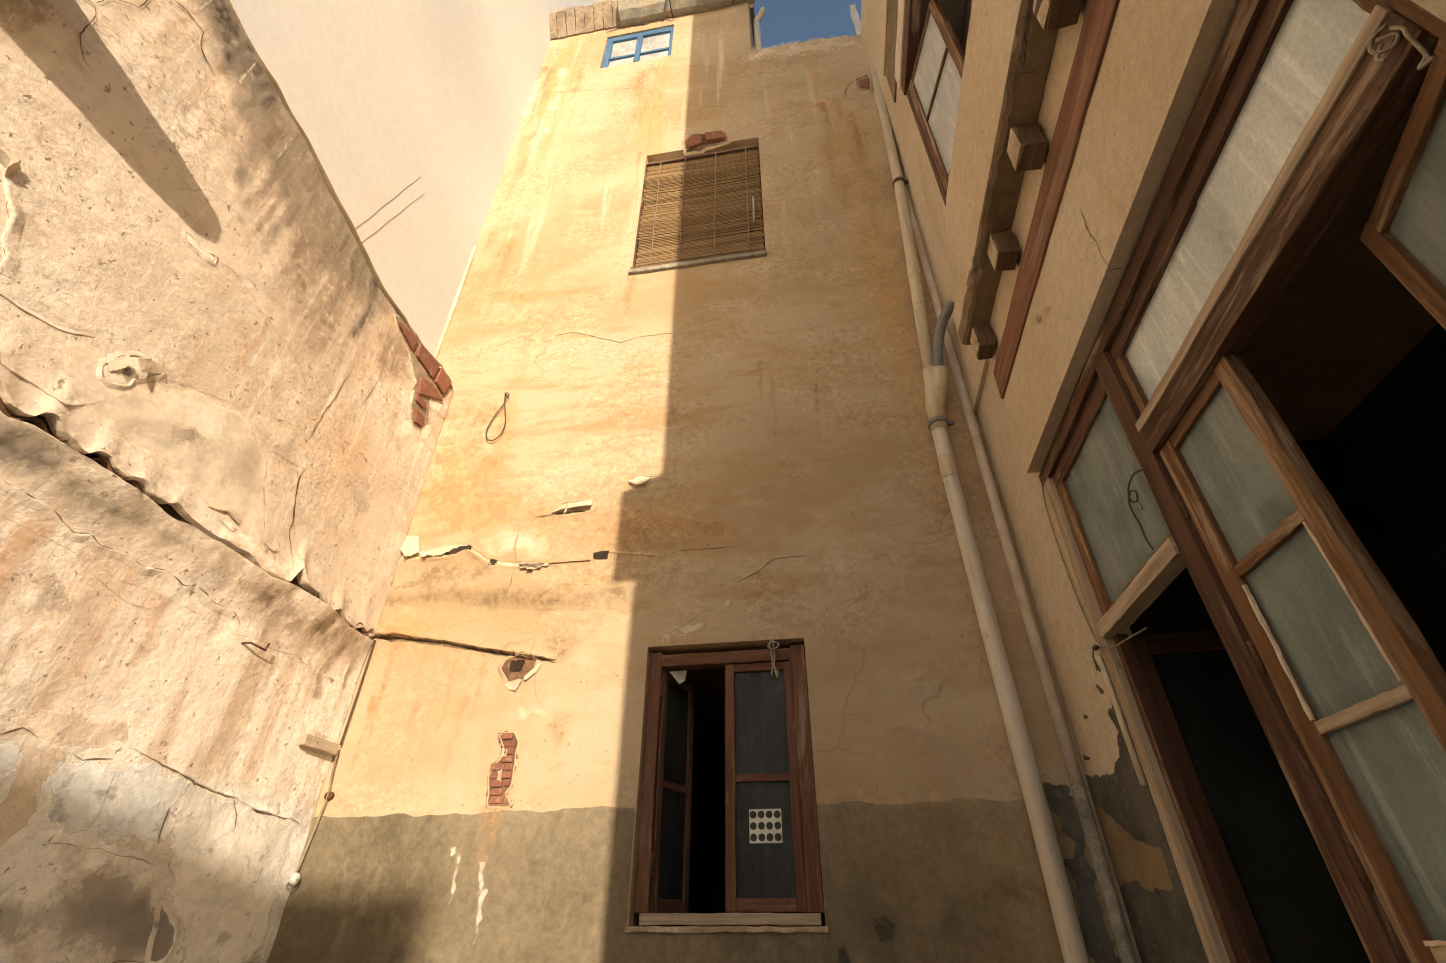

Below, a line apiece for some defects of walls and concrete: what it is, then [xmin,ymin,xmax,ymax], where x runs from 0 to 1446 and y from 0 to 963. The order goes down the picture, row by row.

crack [80,0,308,247]
flaking render [681,130,732,156]
flaking render [393,314,453,431]
crack [0,477,305,664]
peeling [393,533,609,589]
flaking render [497,650,542,691]
crack [0,723,38,737]
crack [43,743,303,866]
flaking render [485,730,521,810]
peeling [1083,662,1209,963]
peeling [1042,782,1121,963]
spalling [144,900,180,963]